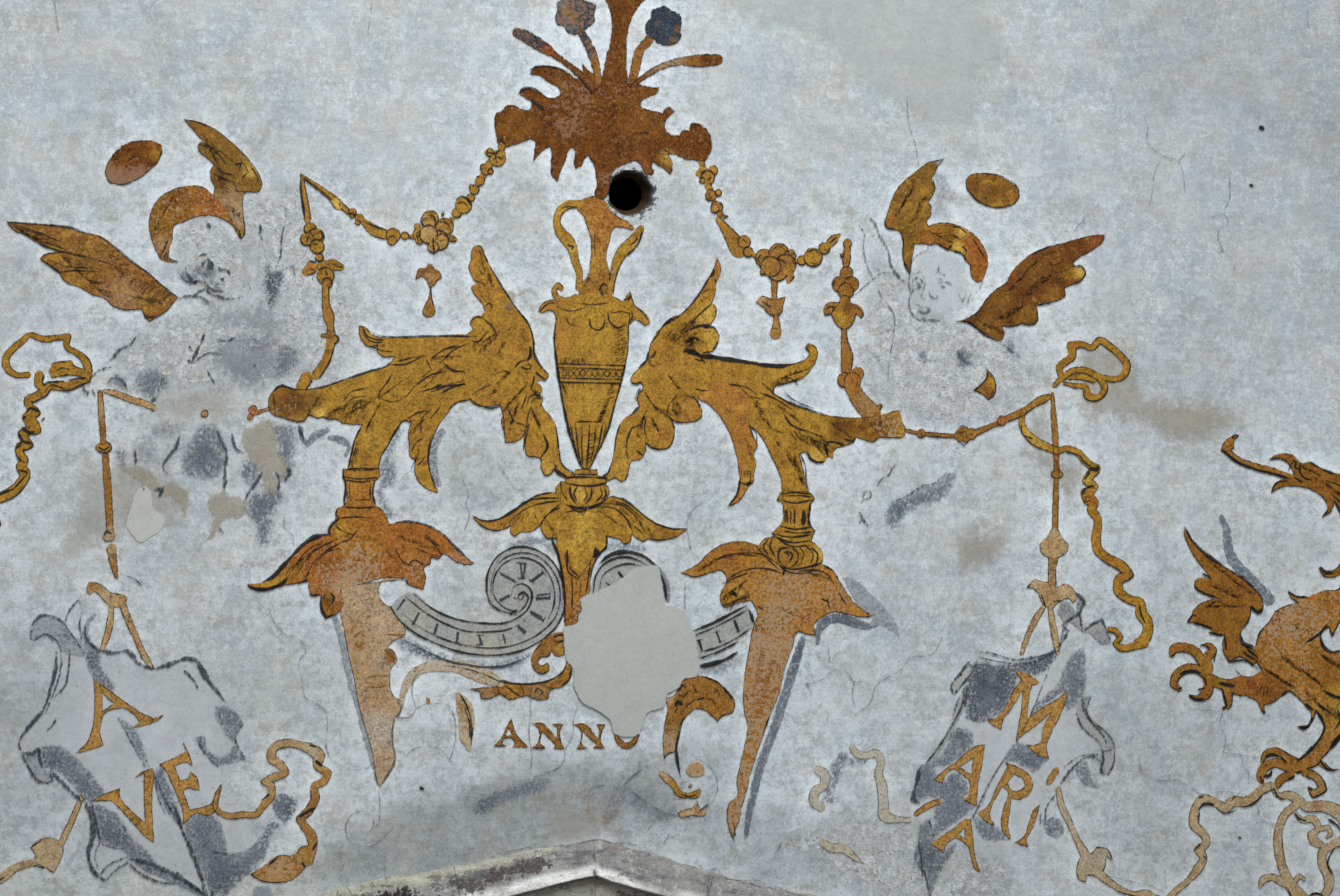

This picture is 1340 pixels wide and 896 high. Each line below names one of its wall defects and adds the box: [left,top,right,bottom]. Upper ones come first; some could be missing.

peeling [122,466,188,516]
peeling [208,491,245,539]